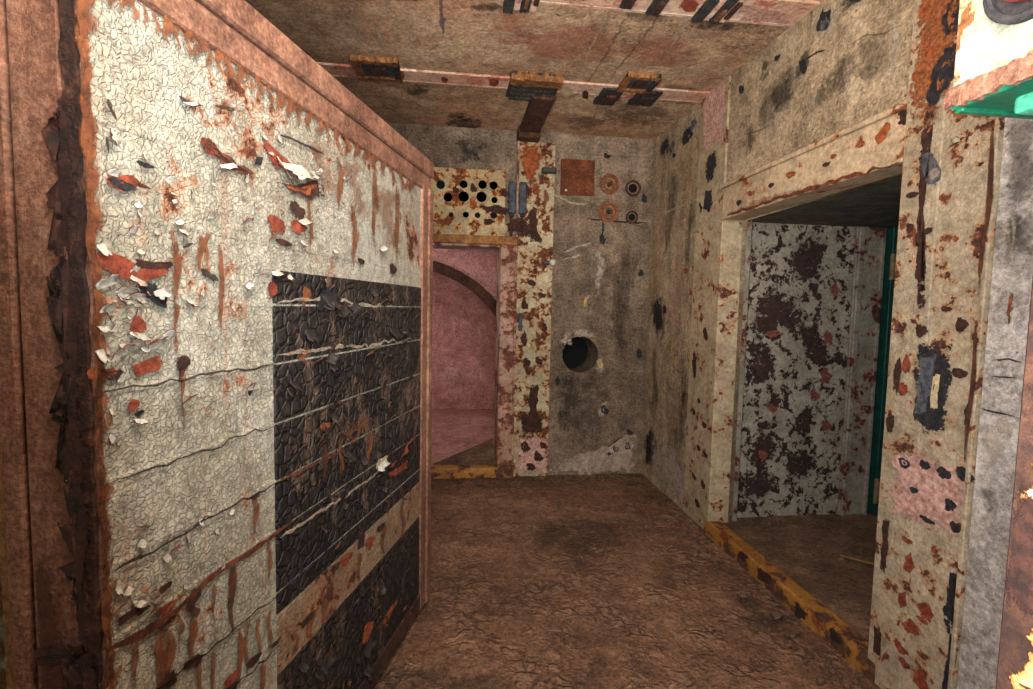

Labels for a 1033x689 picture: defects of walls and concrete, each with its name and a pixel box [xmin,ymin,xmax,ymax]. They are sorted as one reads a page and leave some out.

peeling [164,175,191,236]
peeling [219,135,329,247]
rust [522,143,549,210]
peeling [87,154,179,383]
peeling [244,270,295,298]
peeling [176,356,190,371]
rust [75,0,416,689]
spalling [561,329,596,345]
peeling [128,399,149,425]
peeling [135,524,150,549]
peeling [162,502,235,564]